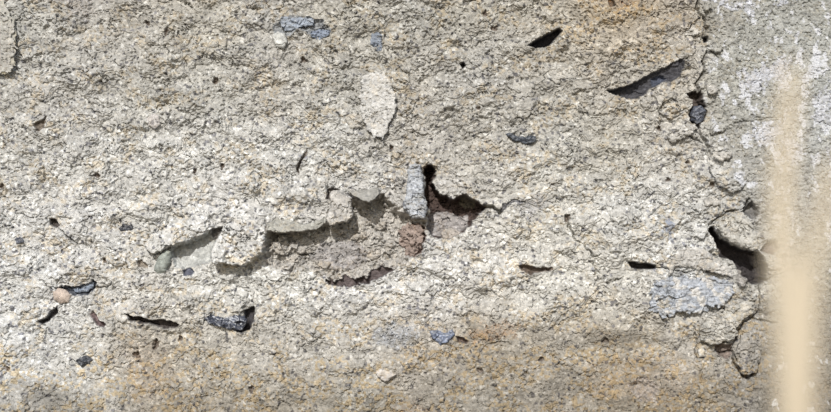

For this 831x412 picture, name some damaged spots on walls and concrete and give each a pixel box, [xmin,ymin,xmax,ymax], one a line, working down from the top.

flaking render [0,0,19,75]
crack [657,0,721,124]
crack [729,115,779,136]
peeling [134,217,225,278]
spalling [262,163,527,289]
flaking render [605,197,771,319]
crack [691,283,773,380]